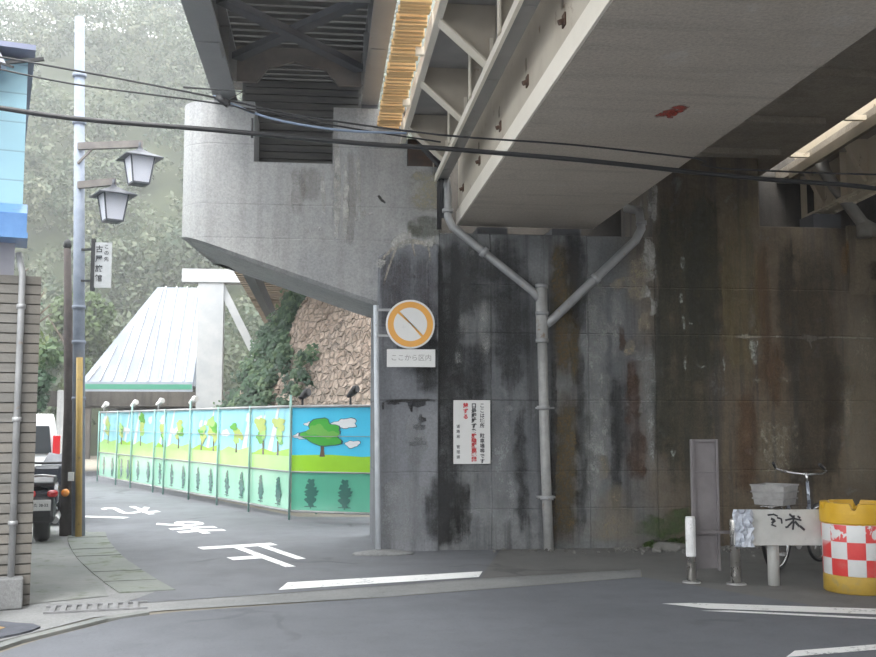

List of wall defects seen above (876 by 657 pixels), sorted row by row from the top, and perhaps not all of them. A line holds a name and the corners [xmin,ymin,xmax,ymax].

leakage [381,241,532,545]
leakage [654,199,724,482]